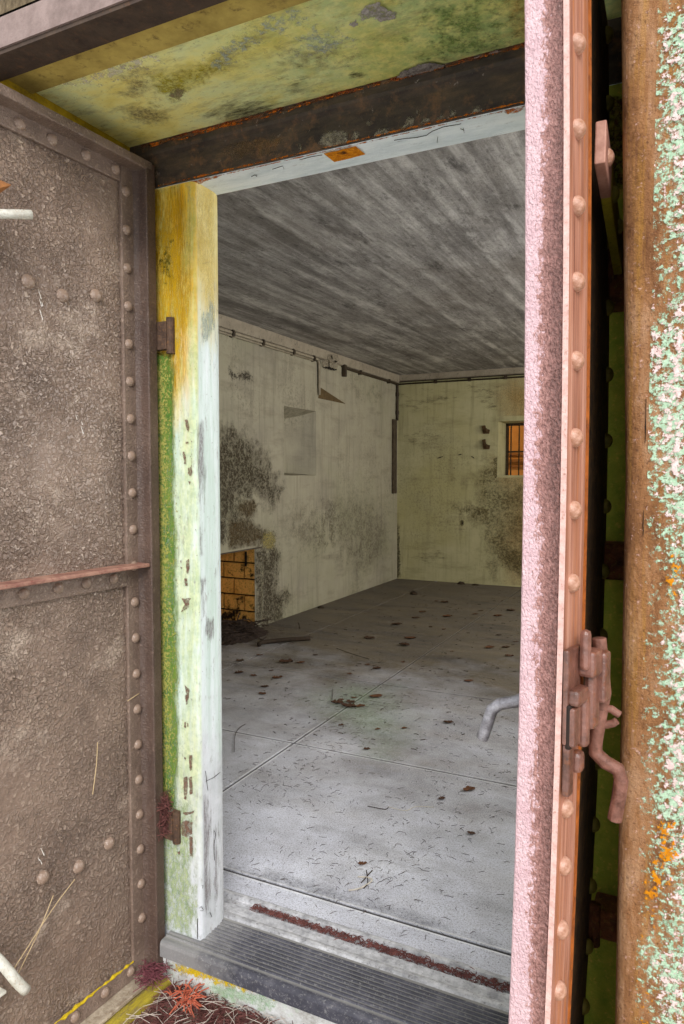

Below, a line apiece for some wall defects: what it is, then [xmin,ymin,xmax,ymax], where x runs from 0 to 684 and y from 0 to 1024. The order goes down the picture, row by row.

corrosion [141,43,525,147]
corrosion [158,101,524,186]
damp [473,469,522,574]